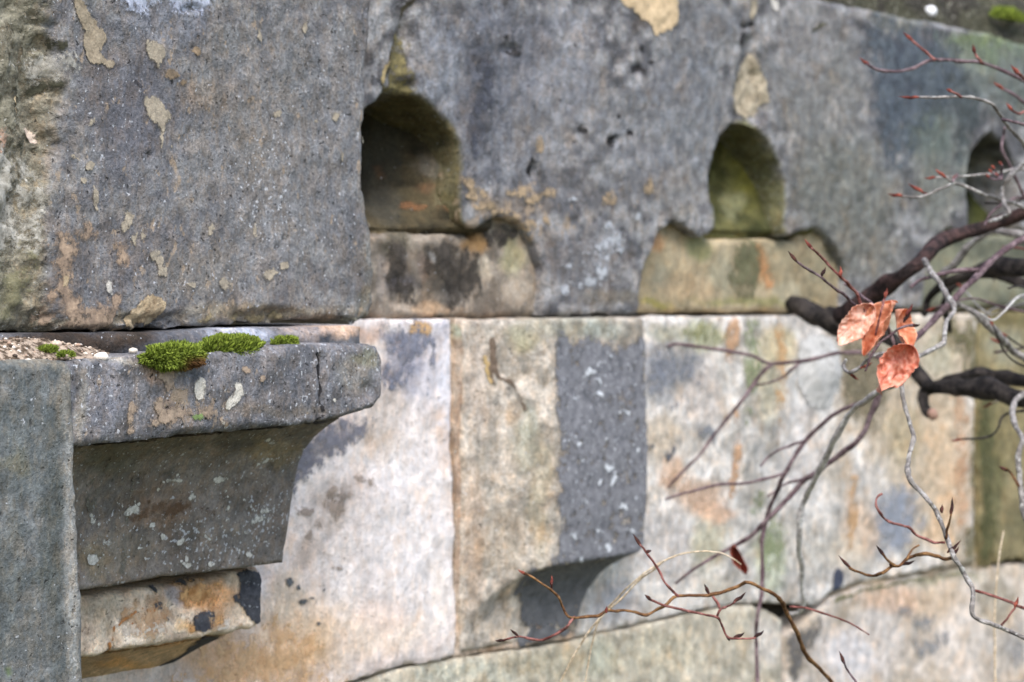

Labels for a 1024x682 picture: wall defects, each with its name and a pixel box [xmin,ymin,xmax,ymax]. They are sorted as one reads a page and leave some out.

spalling [622,0,679,36]
spalling [733,0,770,119]
peeling [144,96,172,148]
spalling [0,0,167,332]
peeling [264,261,289,281]
crack [314,352,327,422]